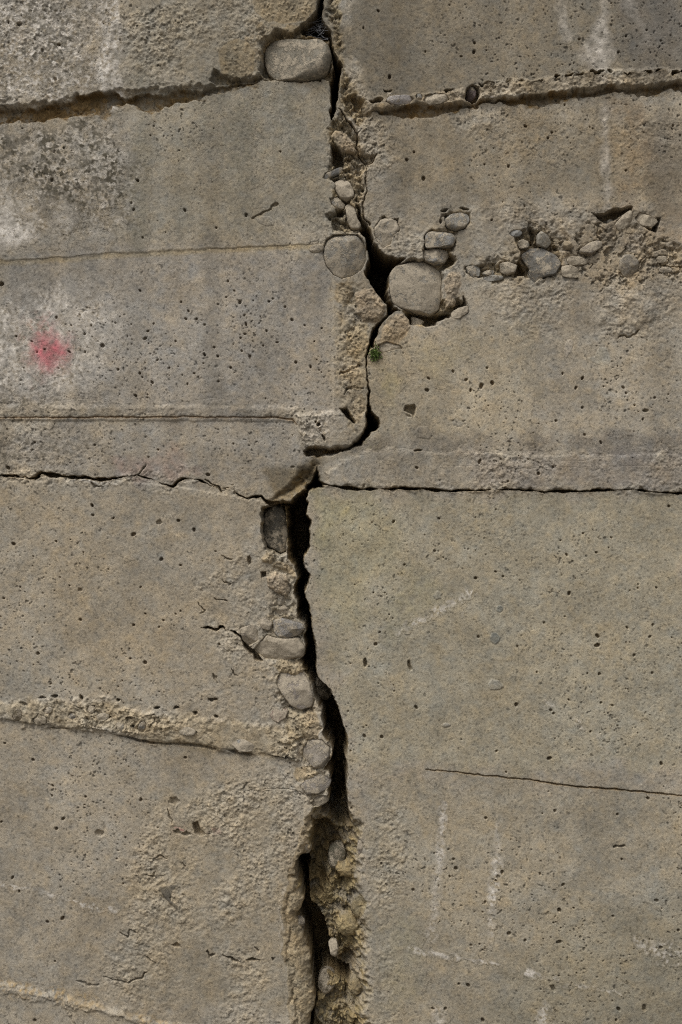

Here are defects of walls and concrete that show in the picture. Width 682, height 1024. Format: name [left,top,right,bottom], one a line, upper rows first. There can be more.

flaking render [598,211,658,242]
crack [1,0,682,816]
spalling [326,236,375,442]
spalling [247,540,322,725]
spalling [76,956,157,988]
spalling [167,797,206,837]
spalling [206,947,276,963]
spalling [239,737,377,1024]
crack [296,852,352,1024]